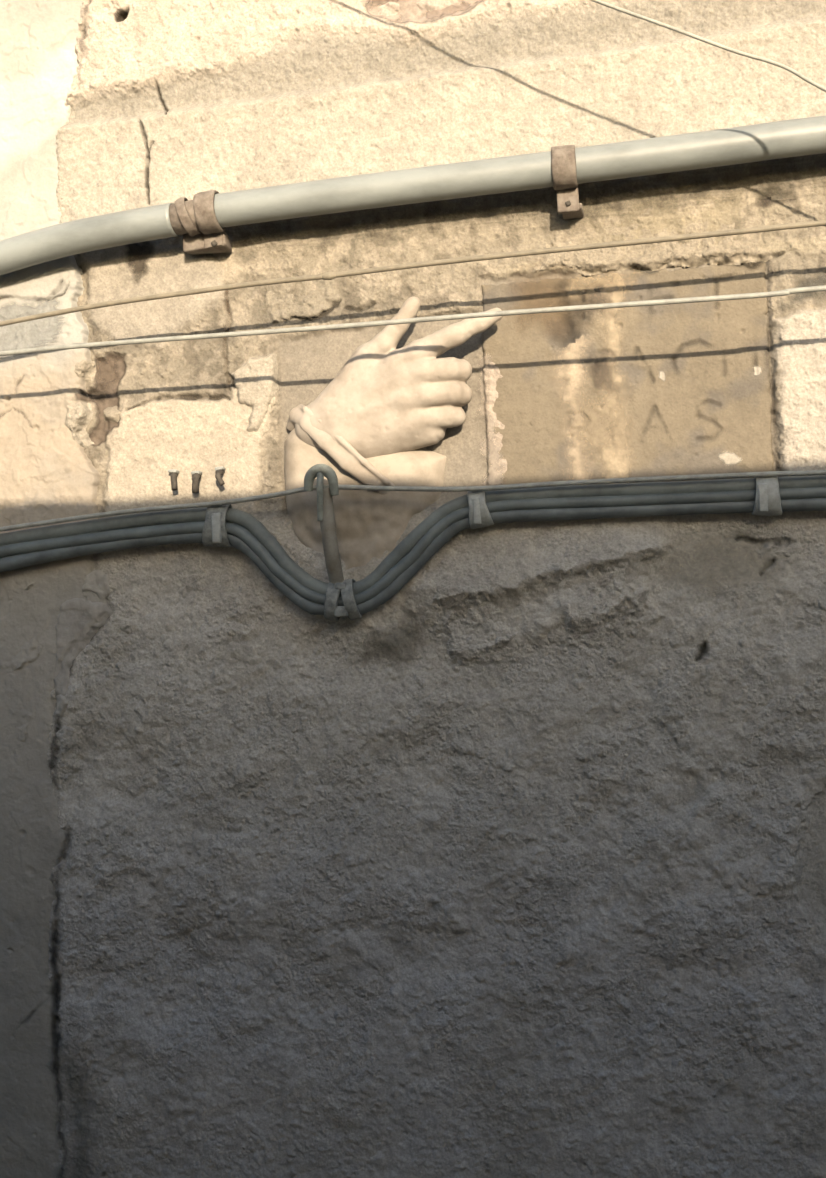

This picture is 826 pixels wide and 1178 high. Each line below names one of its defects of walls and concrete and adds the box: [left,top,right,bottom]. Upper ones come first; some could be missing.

spalling [365,0,483,23]
crack [141,86,168,203]
water stain [570,273,630,484]
crack [51,715,60,781]